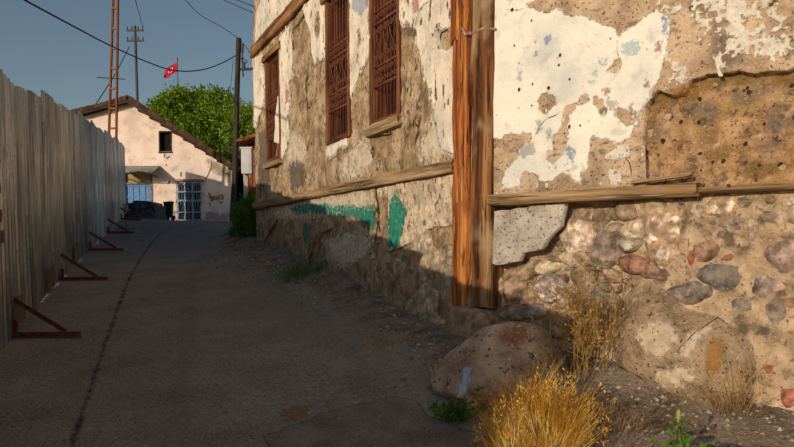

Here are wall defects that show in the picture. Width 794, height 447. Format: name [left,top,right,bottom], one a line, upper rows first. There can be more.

flaking render [285,4,325,62]
flaking render [517,0,794,191]
peeling [274,96,307,185]
peeling [418,113,452,165]
peeling [494,131,532,194]